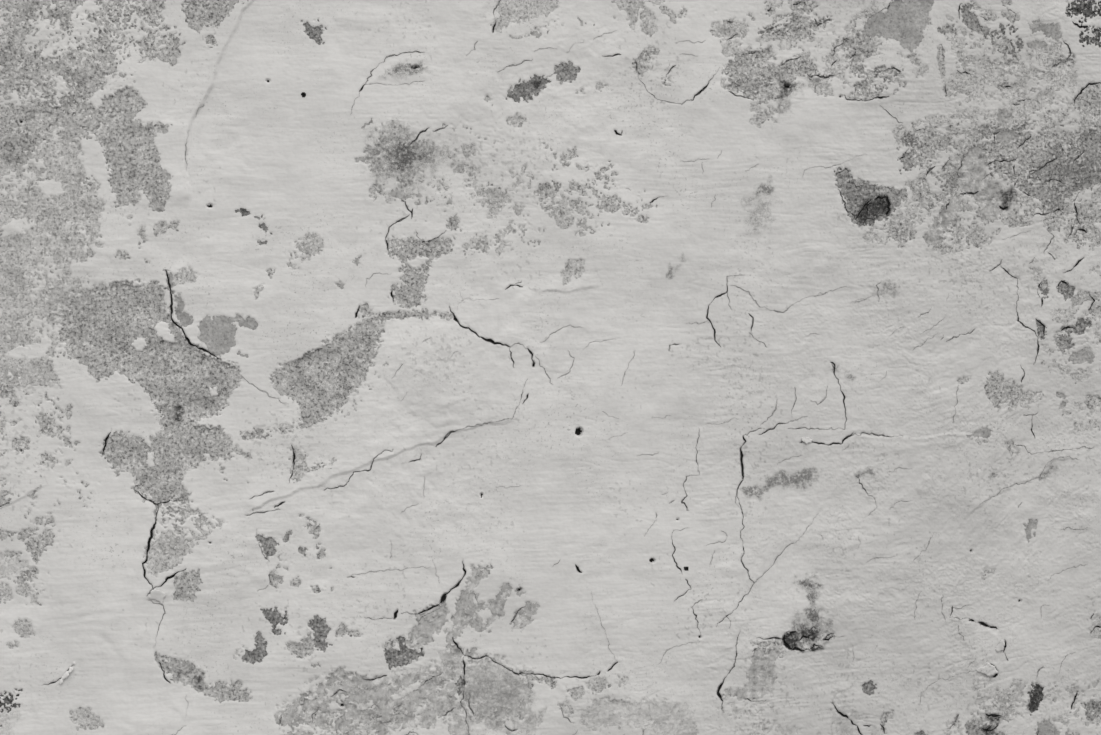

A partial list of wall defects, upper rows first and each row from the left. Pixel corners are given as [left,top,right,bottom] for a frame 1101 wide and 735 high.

crack [768,2,926,131]
crack [804,161,891,221]
peeling [710,0,1101,254]
crack [165,270,219,359]
crack [706,275,880,347]
crack [926,131,1095,382]
crack [325,282,605,512]
crack [646,362,891,708]
peeling [0,689,22,727]
peeling [6,619,35,649]
peeling [233,564,699,735]
crack [423,603,618,733]